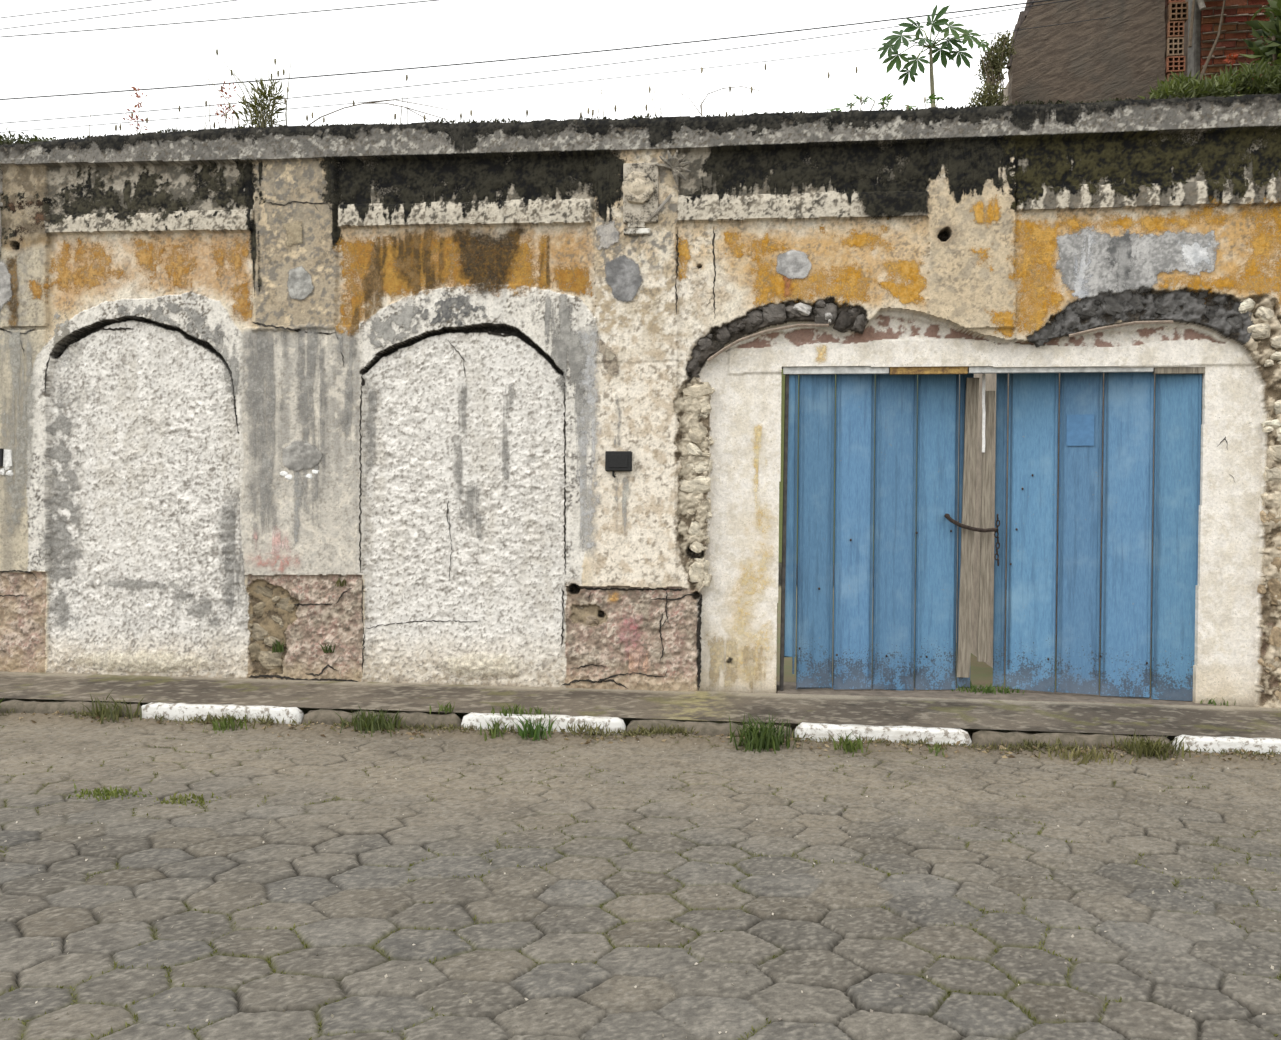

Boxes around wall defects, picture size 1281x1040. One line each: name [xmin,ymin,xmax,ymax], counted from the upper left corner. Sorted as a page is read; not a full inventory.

water stain [327,161,342,249]
water stain [3,93,1281,223]
spalling [246,579,299,676]
water stain [90,228,523,625]
crack [249,322,702,691]
spalling [673,219,927,599]
spalling [970,197,1281,708]